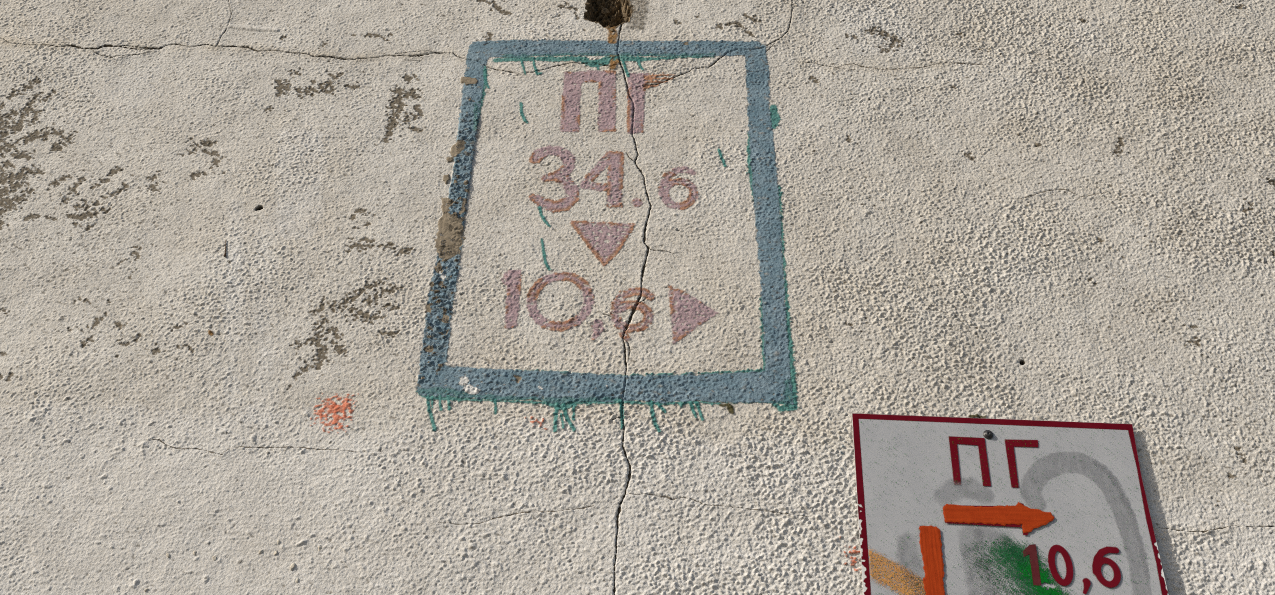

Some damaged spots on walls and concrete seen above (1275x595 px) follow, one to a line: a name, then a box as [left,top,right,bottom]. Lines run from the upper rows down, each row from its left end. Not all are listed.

peeling [477,0,512,16]
spalling [558,0,634,31]
crack [802,62,981,70]
peeling [0,76,161,231]
crack [4,0,807,595]
crack [1166,525,1273,533]